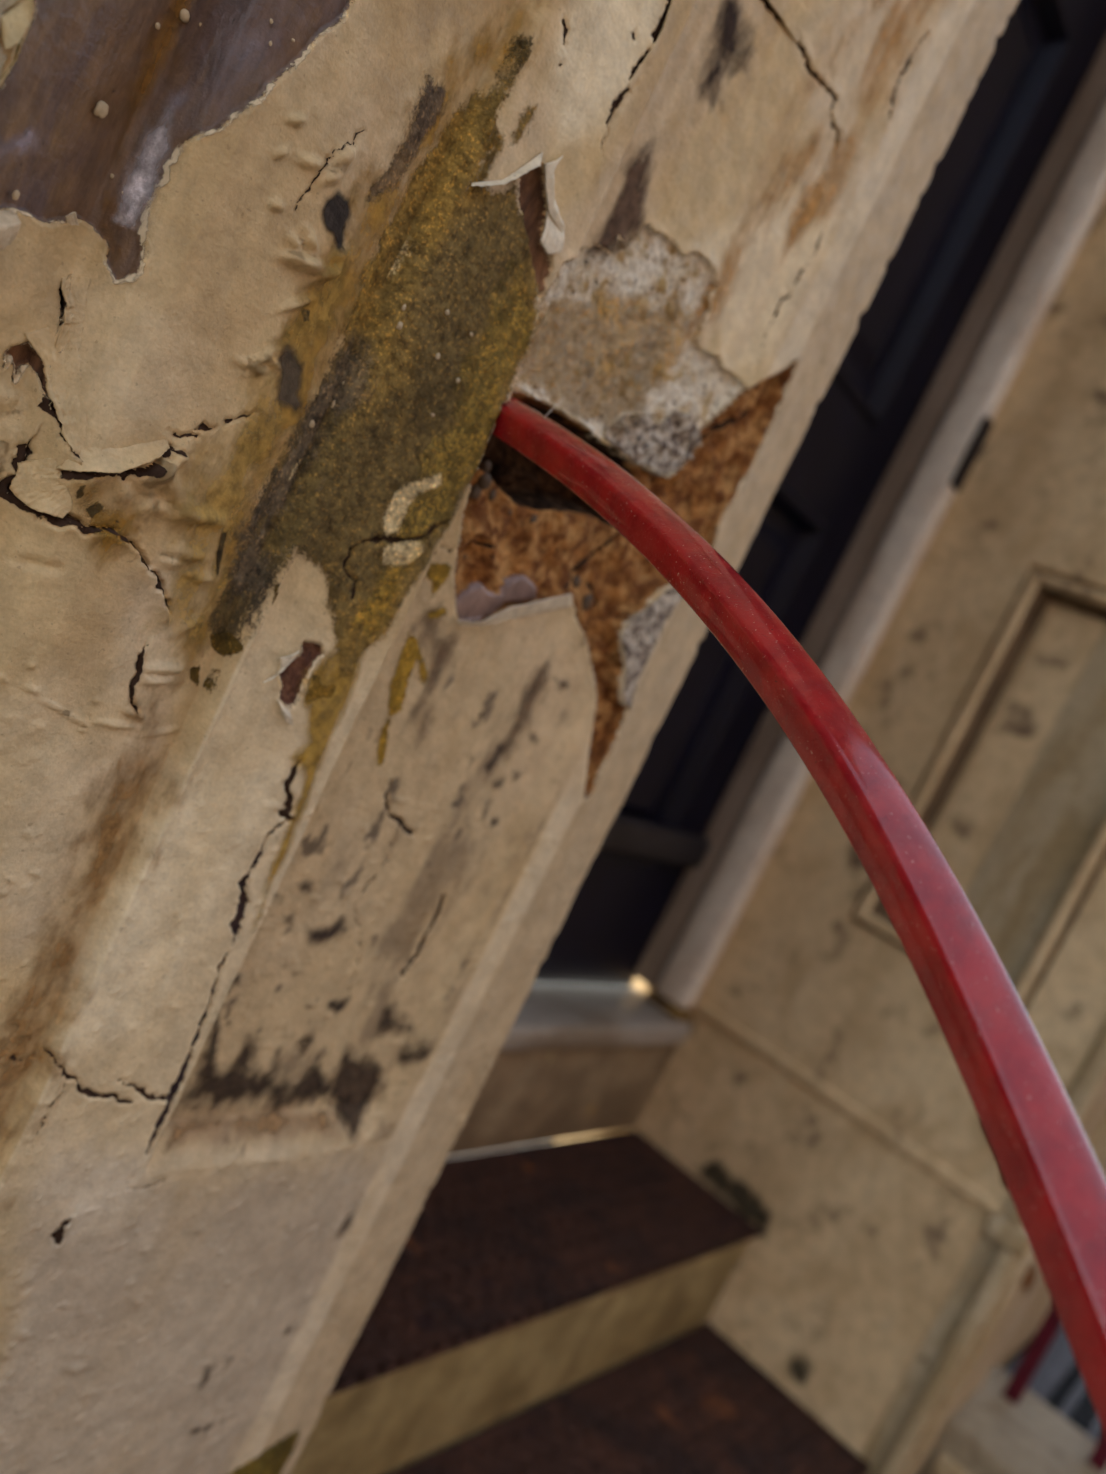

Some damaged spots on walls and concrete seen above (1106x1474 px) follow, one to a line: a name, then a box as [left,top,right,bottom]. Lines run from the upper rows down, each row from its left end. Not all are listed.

peeling [0,0,353,284]
water stain [474,15,538,182]
crack [559,19,568,66]
crack [601,0,687,146]
crack [762,0,840,160]
crack [888,35,926,121]
water stain [170,56,454,690]
water stain [82,485,128,554]
spalling [454,152,797,804]
peeling [263,641,325,725]
crack [9,762,300,1189]